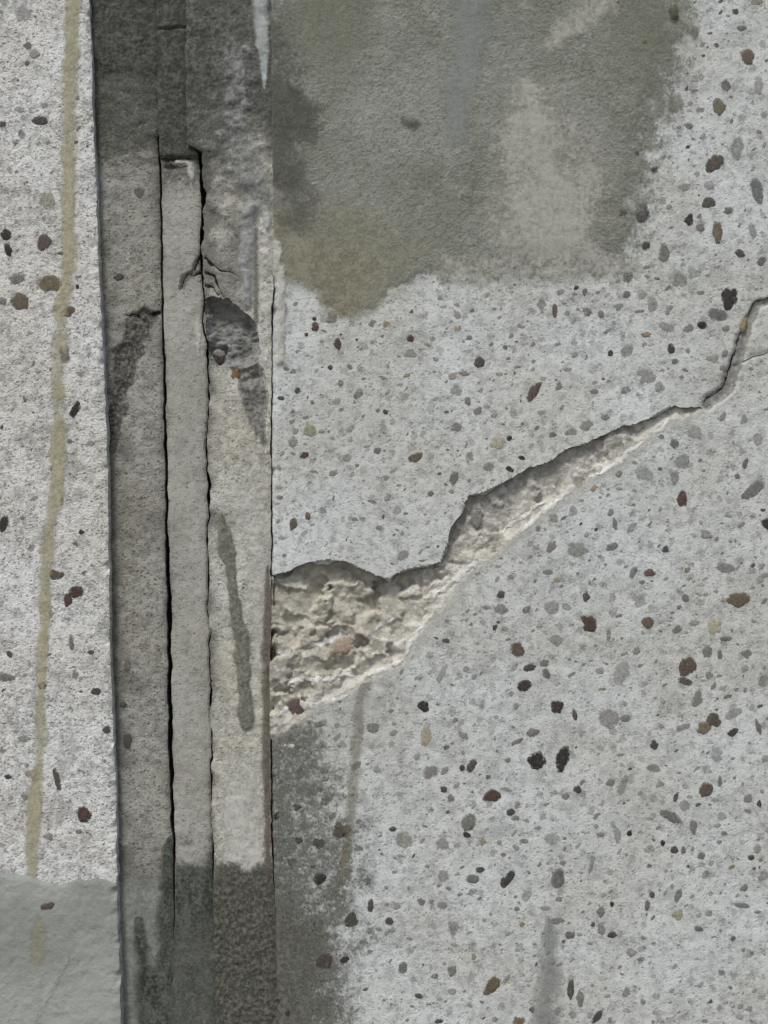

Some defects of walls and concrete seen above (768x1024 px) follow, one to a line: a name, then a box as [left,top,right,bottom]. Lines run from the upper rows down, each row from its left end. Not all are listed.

leakage [543,0,617,53]
leakage [436,75,641,283]
crack [703,297,768,410]
crack [127,134,233,887]
spalling [194,297,711,750]
leakage [119,721,377,1024]